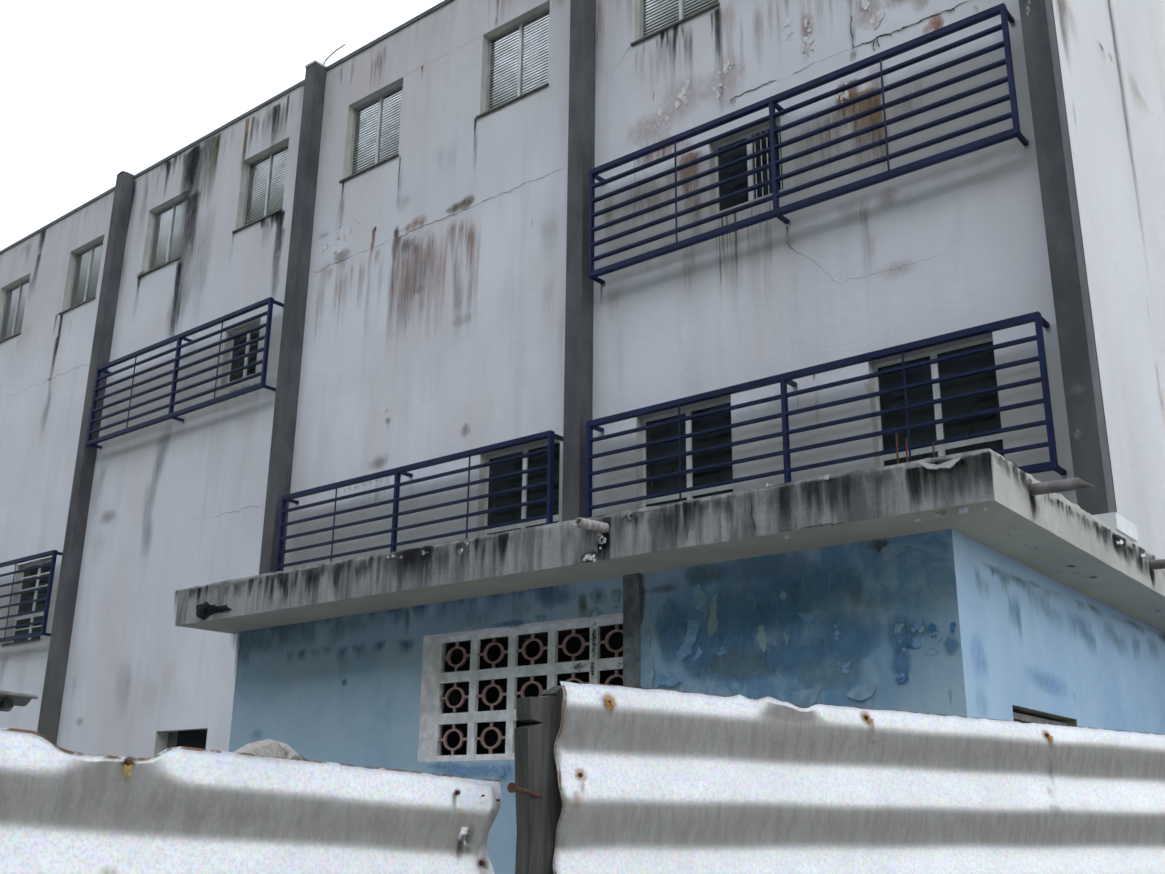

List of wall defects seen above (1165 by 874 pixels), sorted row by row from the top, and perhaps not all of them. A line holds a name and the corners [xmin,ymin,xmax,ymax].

crack [730,0,969,100]
rust [836,80,882,141]
leakage [165,135,220,316]
crack [316,168,562,273]
leakage [779,475,849,509]
leakage [907,452,1070,511]
leakage [249,555,381,597]
leakage [398,546,433,571]
leakage [583,517,611,562]
leakage [1084,515,1155,584]
peeling [640,560,876,707]
peeling [865,593,958,684]